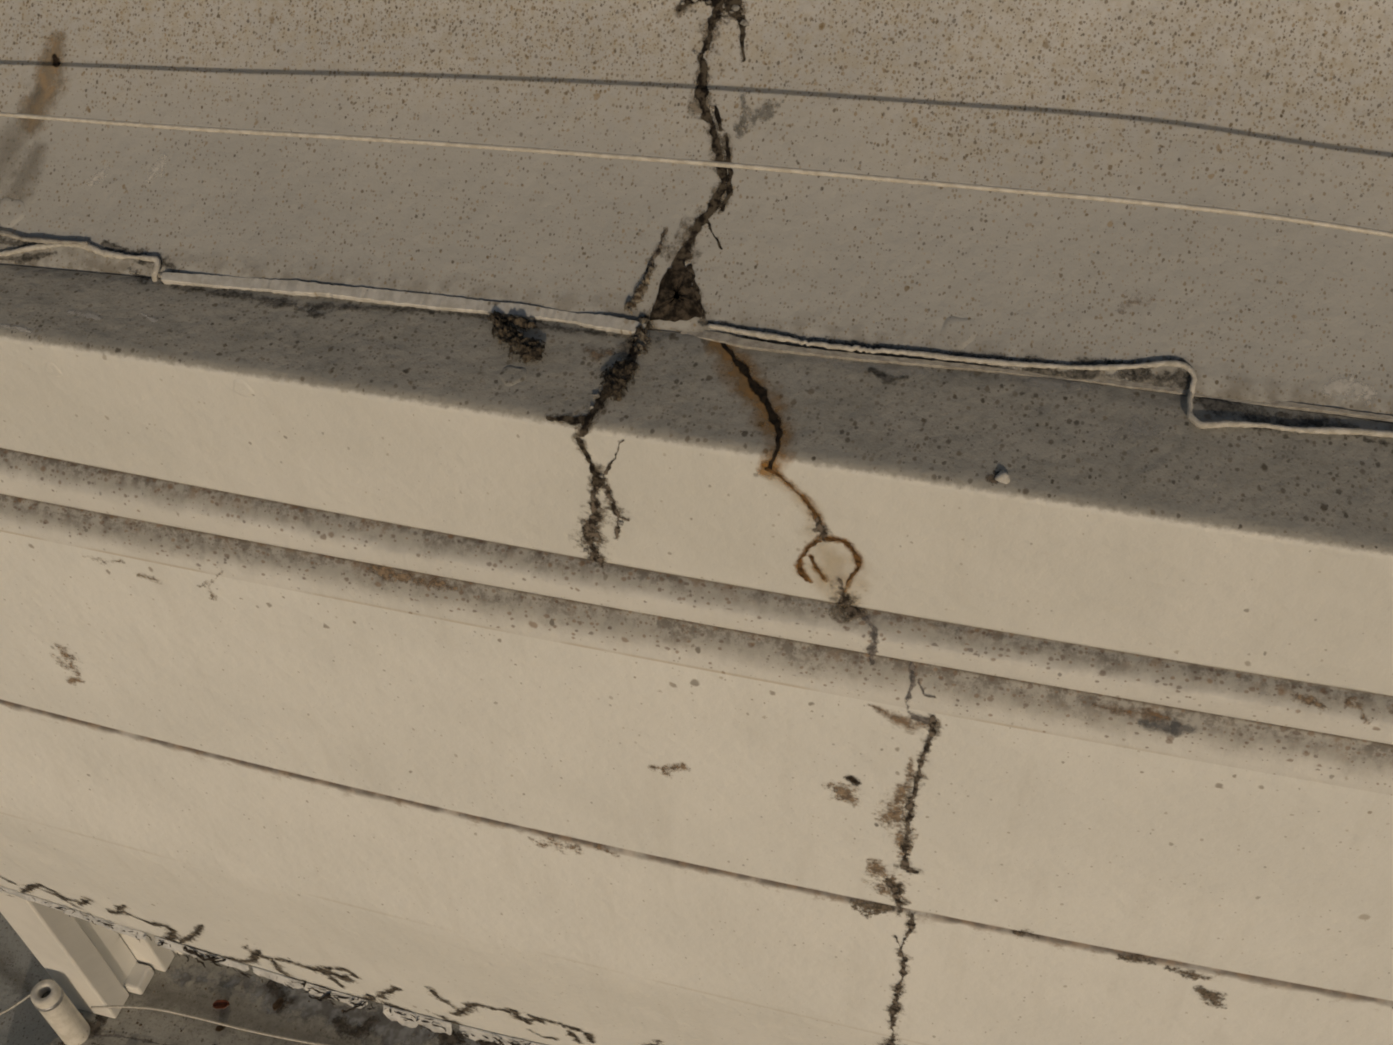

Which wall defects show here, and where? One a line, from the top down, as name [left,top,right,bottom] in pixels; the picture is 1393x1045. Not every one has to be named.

crack [546,0,878,665]
rust [707,341,862,593]
peeling [0,886,544,1045]
crack [880,662,941,1045]